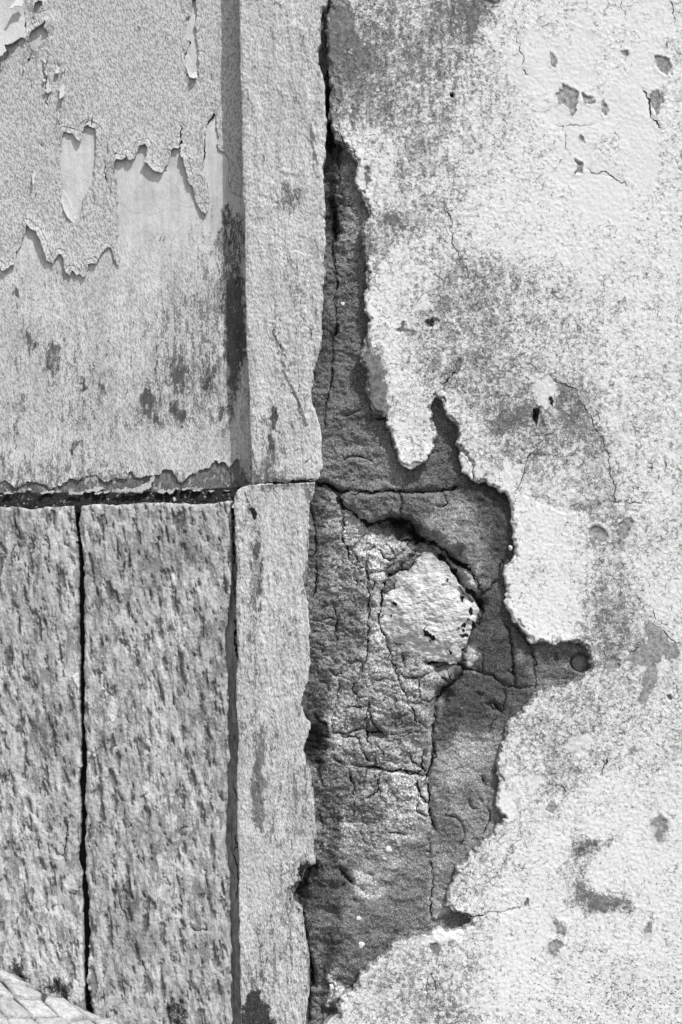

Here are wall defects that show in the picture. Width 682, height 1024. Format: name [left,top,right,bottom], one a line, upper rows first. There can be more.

peeling [0,0,65,99]
peeling [184,0,205,80]
spalling [555,83,607,116]
spalling [650,91,664,115]
spalling [654,54,671,77]
peeling [56,112,102,223]
peeling [109,116,229,215]
peeling [0,219,115,294]
water stain [138,201,247,428]
spalling [272,0,590,1024]
crack [273,449,538,917]